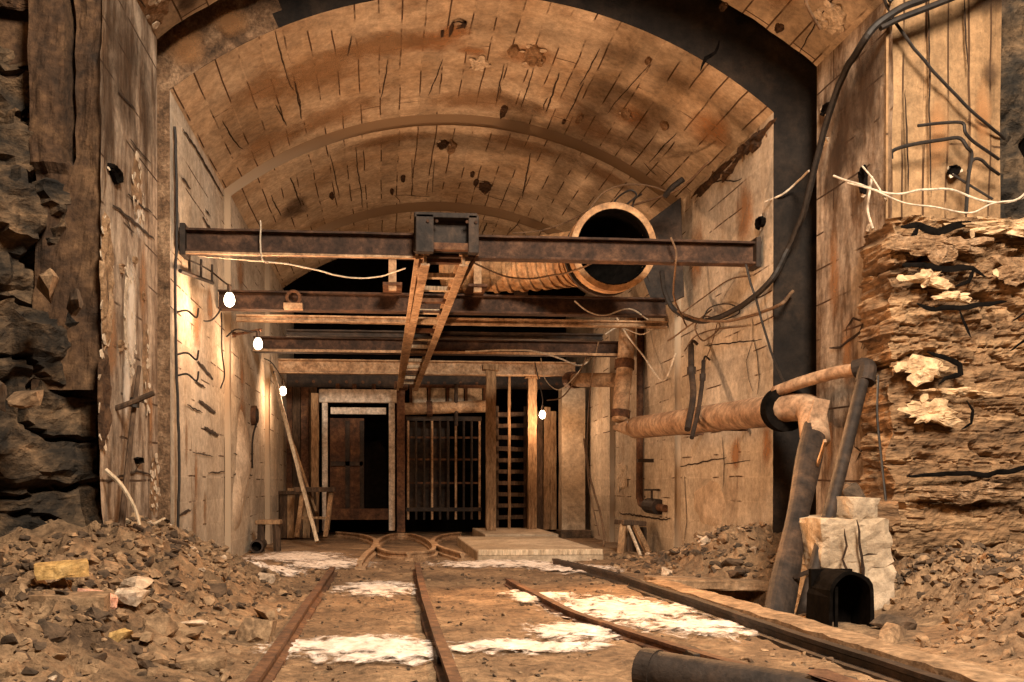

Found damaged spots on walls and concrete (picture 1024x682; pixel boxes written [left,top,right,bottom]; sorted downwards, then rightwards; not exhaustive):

spalling [813,0,847,34]
spalling [507,44,547,67]
spalling [691,118,777,200]
spalling [875,375,887,501]
spalling [913,480,1024,504]